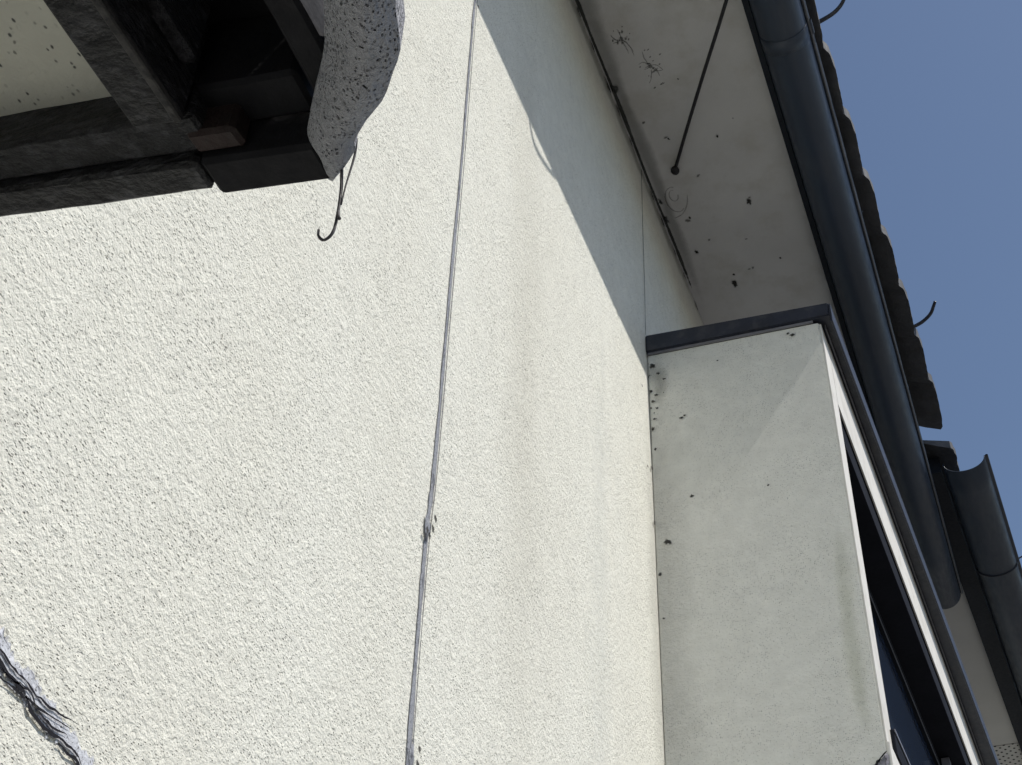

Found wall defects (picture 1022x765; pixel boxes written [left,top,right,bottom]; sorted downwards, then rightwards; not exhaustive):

crack [0,626,94,765]
flaking render [875,751,889,765]